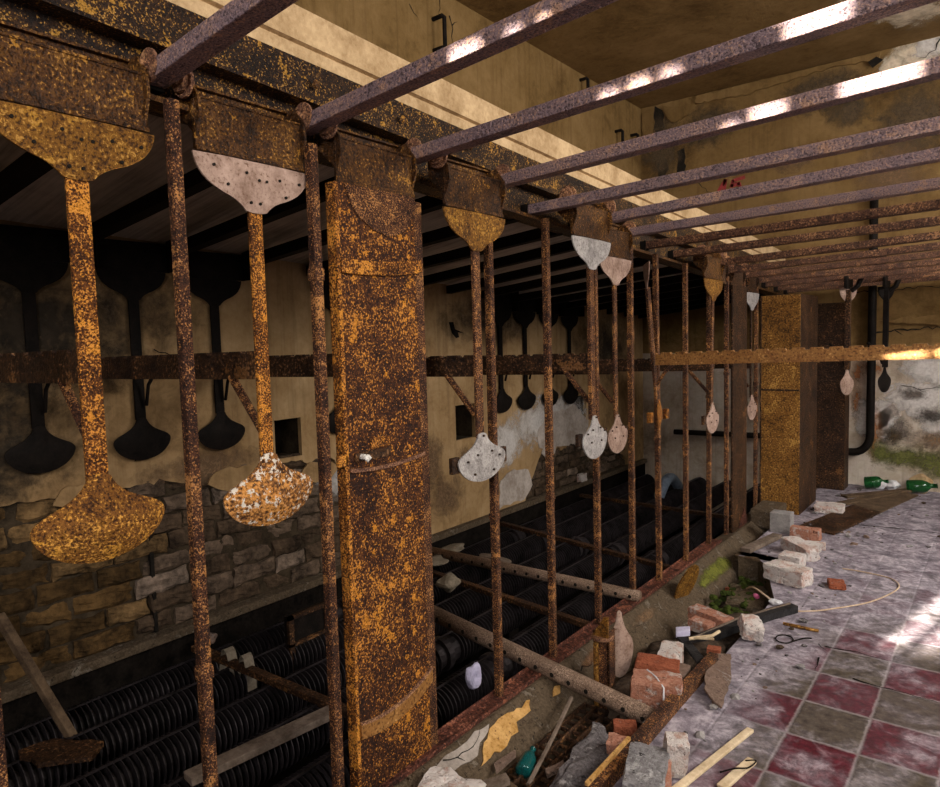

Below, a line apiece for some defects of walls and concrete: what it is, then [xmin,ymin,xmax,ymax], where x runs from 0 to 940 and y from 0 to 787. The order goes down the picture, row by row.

flaking render [499,405,625,509]
peeling [877,403,901,437]
flaking render [0,479,193,670]
flaking render [201,453,323,612]
flaking render [331,459,341,567]